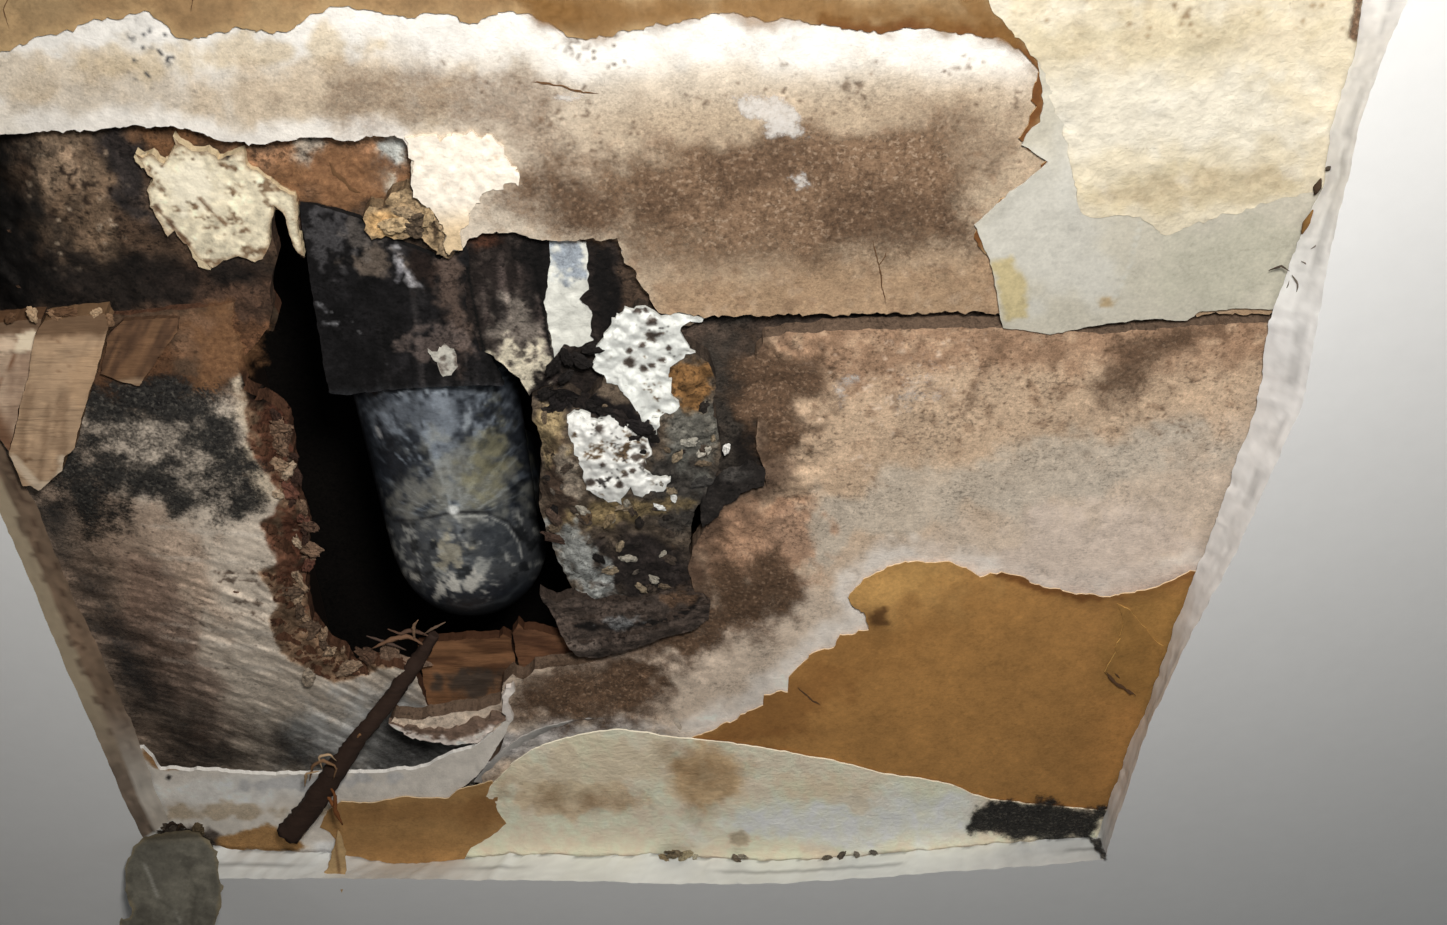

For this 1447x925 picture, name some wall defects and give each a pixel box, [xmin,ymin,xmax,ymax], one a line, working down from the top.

flaking render [134,130,306,270]
flaking render [363,129,520,259]
leakage [504,96,977,264]
peeling [989,0,1363,235]
mould [46,374,270,541]
flaking render [532,298,730,599]
leakage [731,346,857,457]
leakage [1099,324,1222,403]
flaking render [336,644,433,677]
flaking render [388,681,515,745]
leakage [514,537,805,734]
mould [966,795,1107,860]